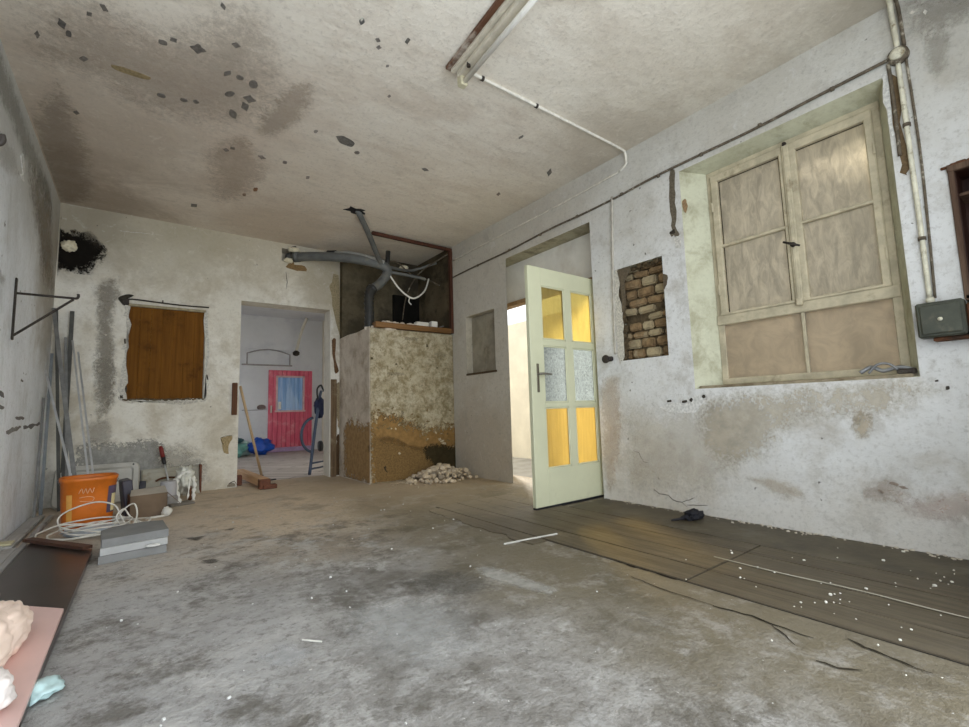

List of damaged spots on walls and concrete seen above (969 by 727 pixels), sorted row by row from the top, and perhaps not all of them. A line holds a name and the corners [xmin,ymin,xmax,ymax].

damp [111,65,151,80]
damp [224,71,258,119]
flaking render [669,169,688,248]
damp [97,281,118,406]
flaking render [614,257,662,365]
crack [614,560,933,674]